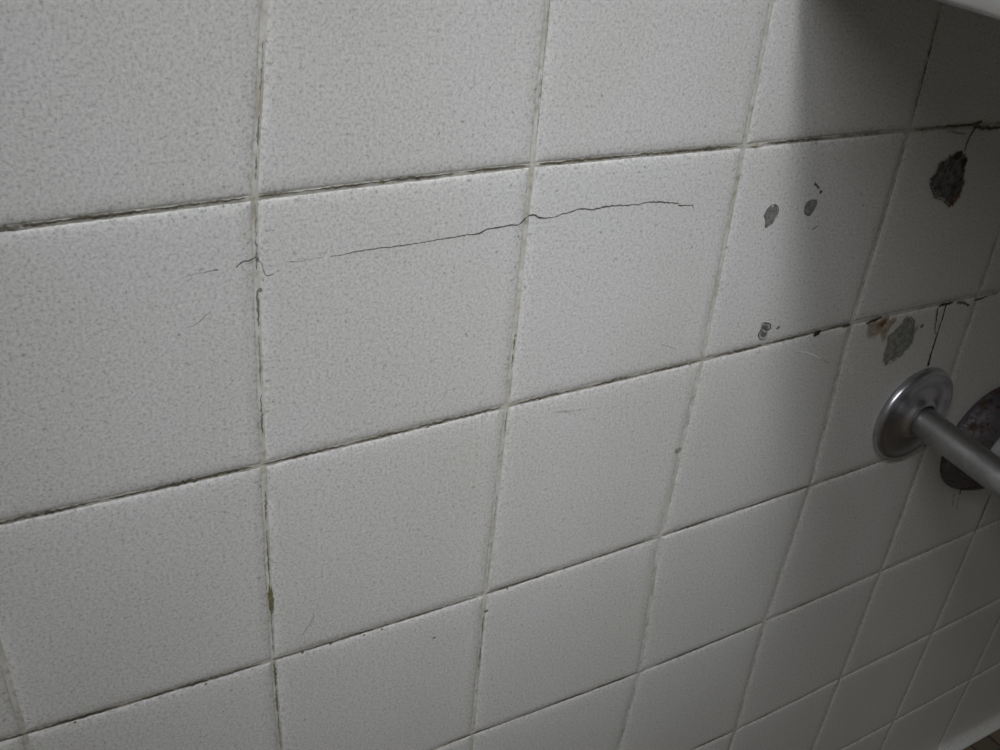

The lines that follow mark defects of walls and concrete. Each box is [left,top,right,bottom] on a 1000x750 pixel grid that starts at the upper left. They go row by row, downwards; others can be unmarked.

crack [320,201,693,258]
peeling [764,204,779,228]
peeling [804,183,822,216]
spalling [929,151,968,207]
crack [205,256,293,276]
spalling [883,317,924,366]
crack [927,292,998,366]